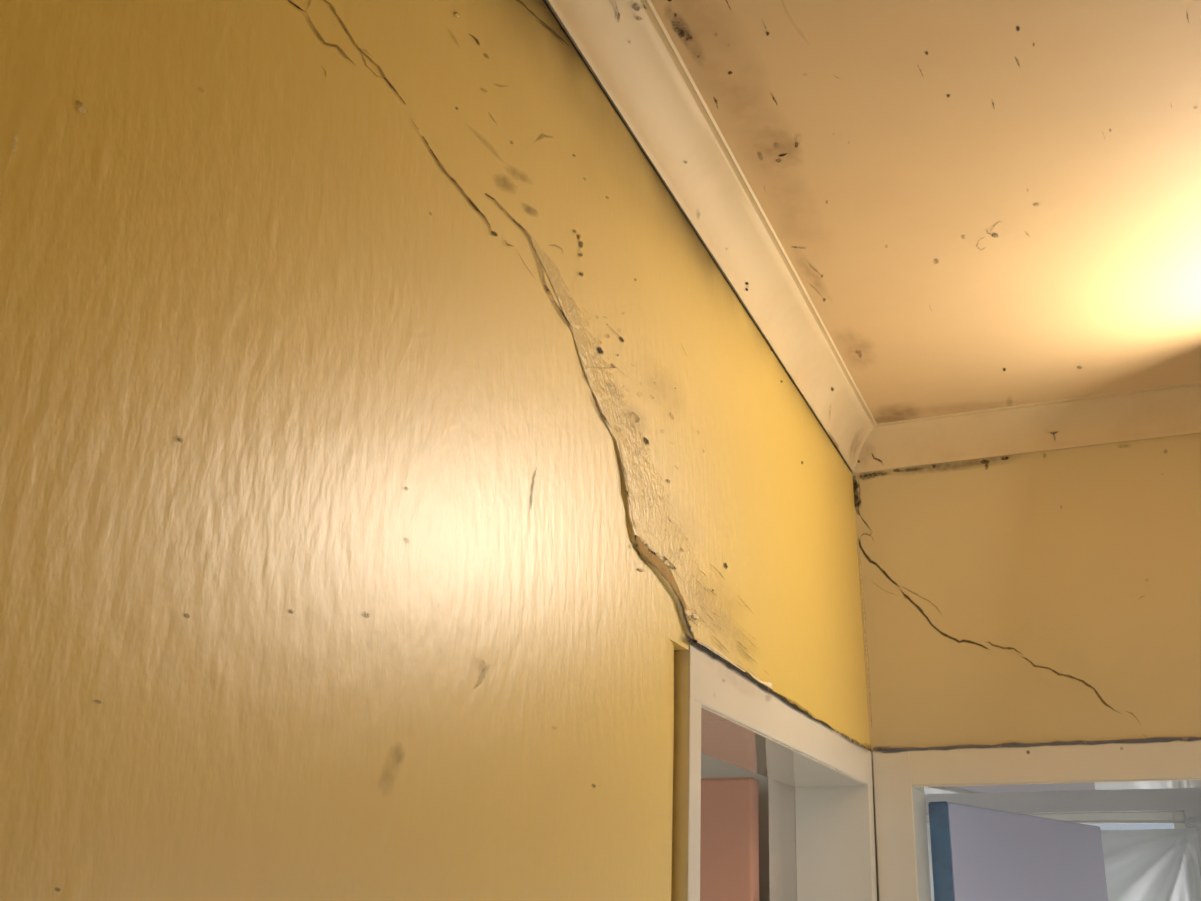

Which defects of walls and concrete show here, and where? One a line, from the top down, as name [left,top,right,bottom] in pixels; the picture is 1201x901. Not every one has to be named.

crack [288,0,406,104]
crack [423,137,571,326]
crack [543,0,1201,753]
spalling [635,535,772,689]